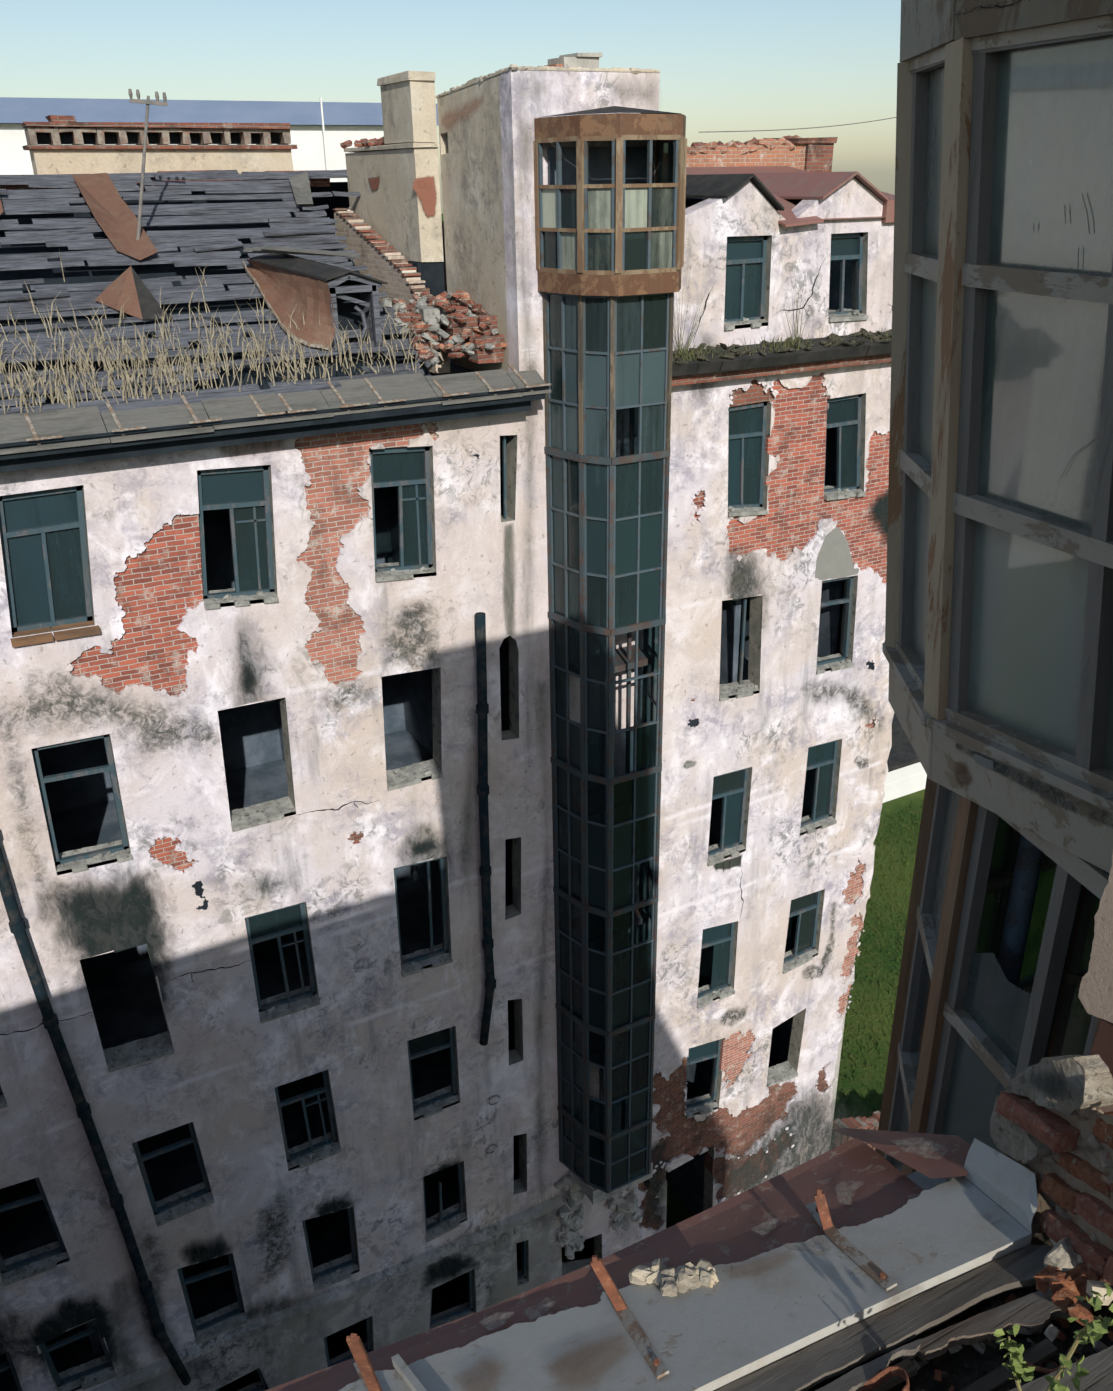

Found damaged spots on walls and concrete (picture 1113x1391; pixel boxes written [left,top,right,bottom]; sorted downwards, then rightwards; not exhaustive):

crack [955,0,1030,15]
flaking render [412,176,437,217]
flaking render [725,372,890,583]
flaking render [294,422,438,685]
flaking render [66,514,203,699]
water stain [389,604,433,661]
flaking render [146,832,211,912]
flaking render [805,856,871,1019]
flaking render [713,1009,758,1089]
flaking render [815,1059,838,1095]
flaking render [638,1057,797,1232]